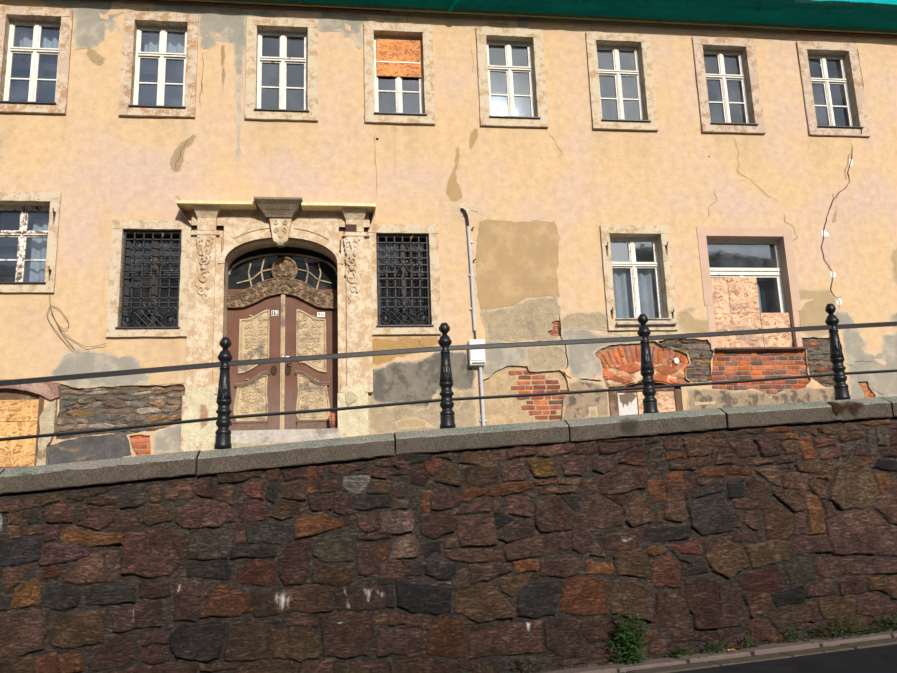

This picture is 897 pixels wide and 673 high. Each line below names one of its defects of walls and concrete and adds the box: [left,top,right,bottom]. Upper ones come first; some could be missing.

peeling [40,0,403,164]
crack [821,128,862,312]
flaking render [51,349,185,461]
flaking render [368,289,897,434]